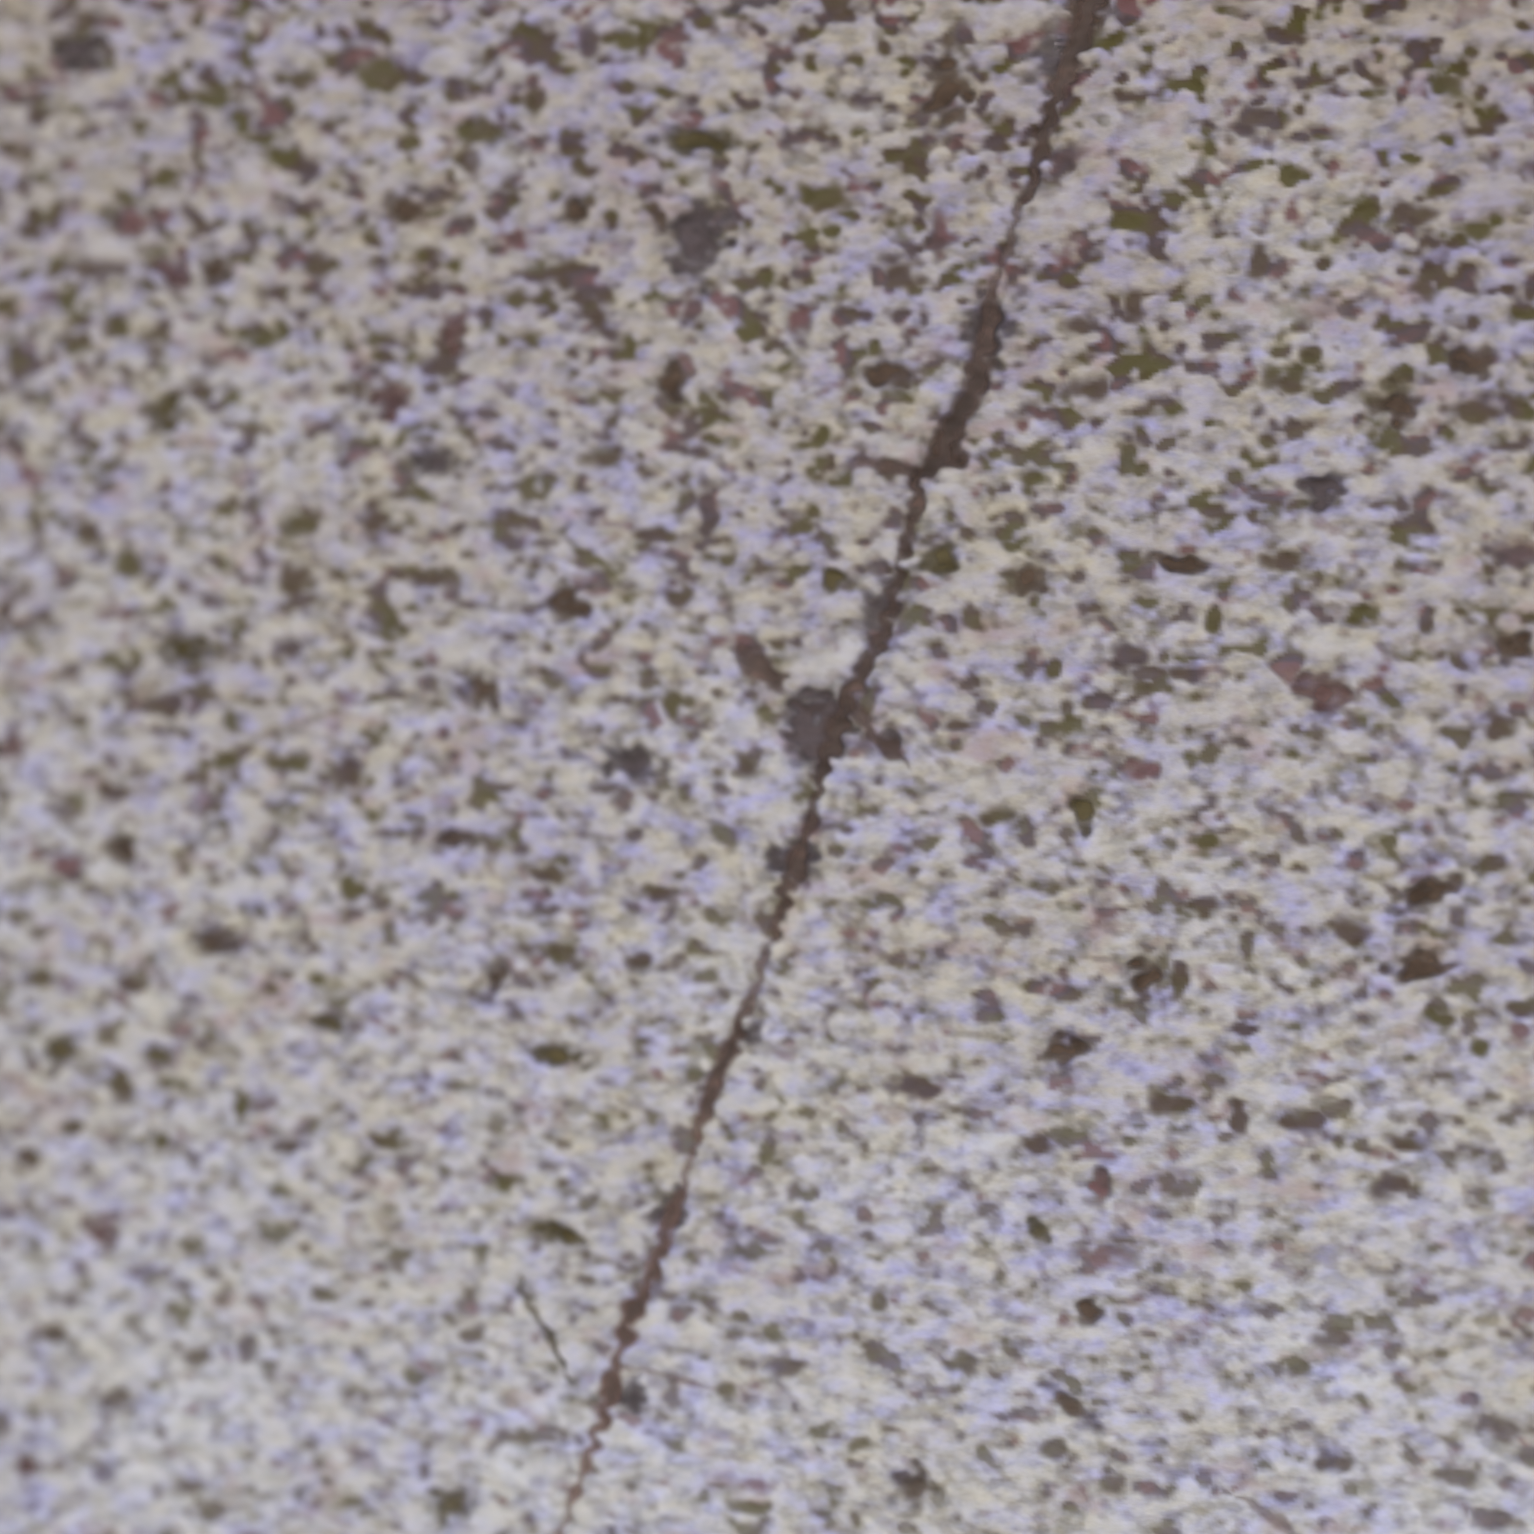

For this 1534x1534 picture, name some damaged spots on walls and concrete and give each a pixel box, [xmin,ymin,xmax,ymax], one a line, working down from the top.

crack [557,0,1111,1534]